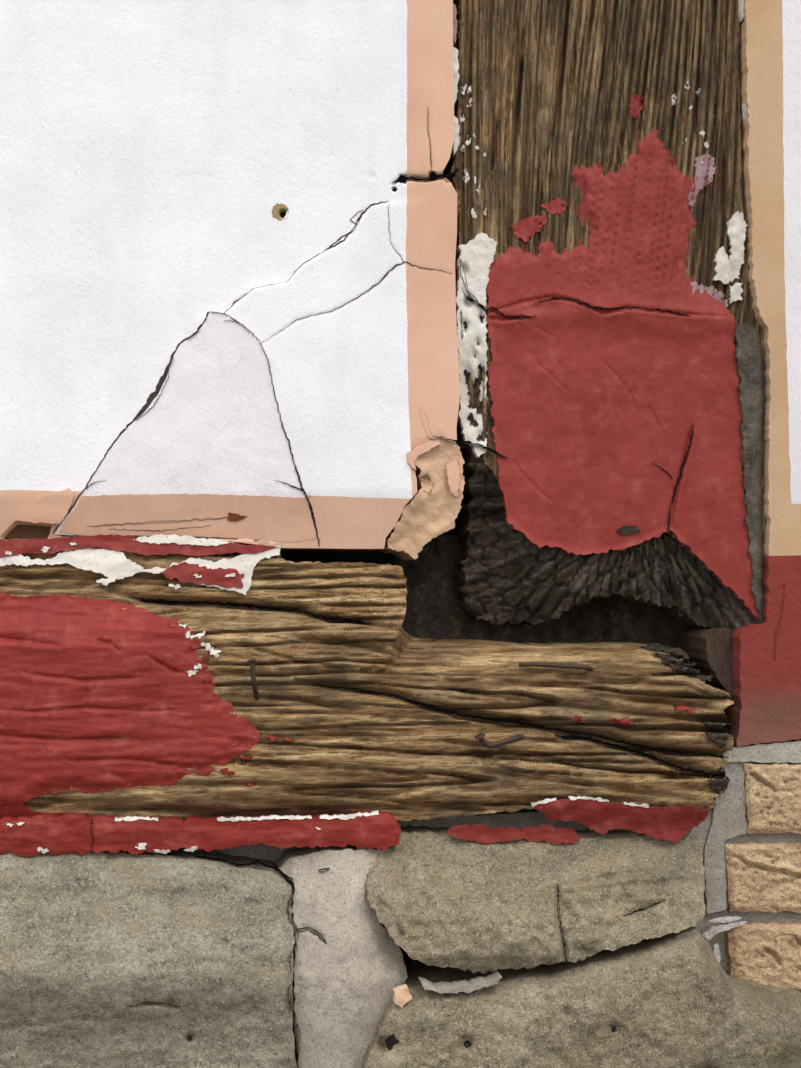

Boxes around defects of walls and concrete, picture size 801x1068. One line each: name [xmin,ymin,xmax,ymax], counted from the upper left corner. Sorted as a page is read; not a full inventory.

peeling [628,92,645,119]
peeling [661,76,703,121]
spalling [429,169,480,195]
peeling [687,130,725,213]
peeling [511,198,569,242]
peeling [690,281,729,308]
crack [53,106,693,547]
spalling [464,364,493,441]
spalling [378,437,465,560]
peeling [531,796,711,843]
peeling [135,843,170,854]
crack [557,886,568,964]